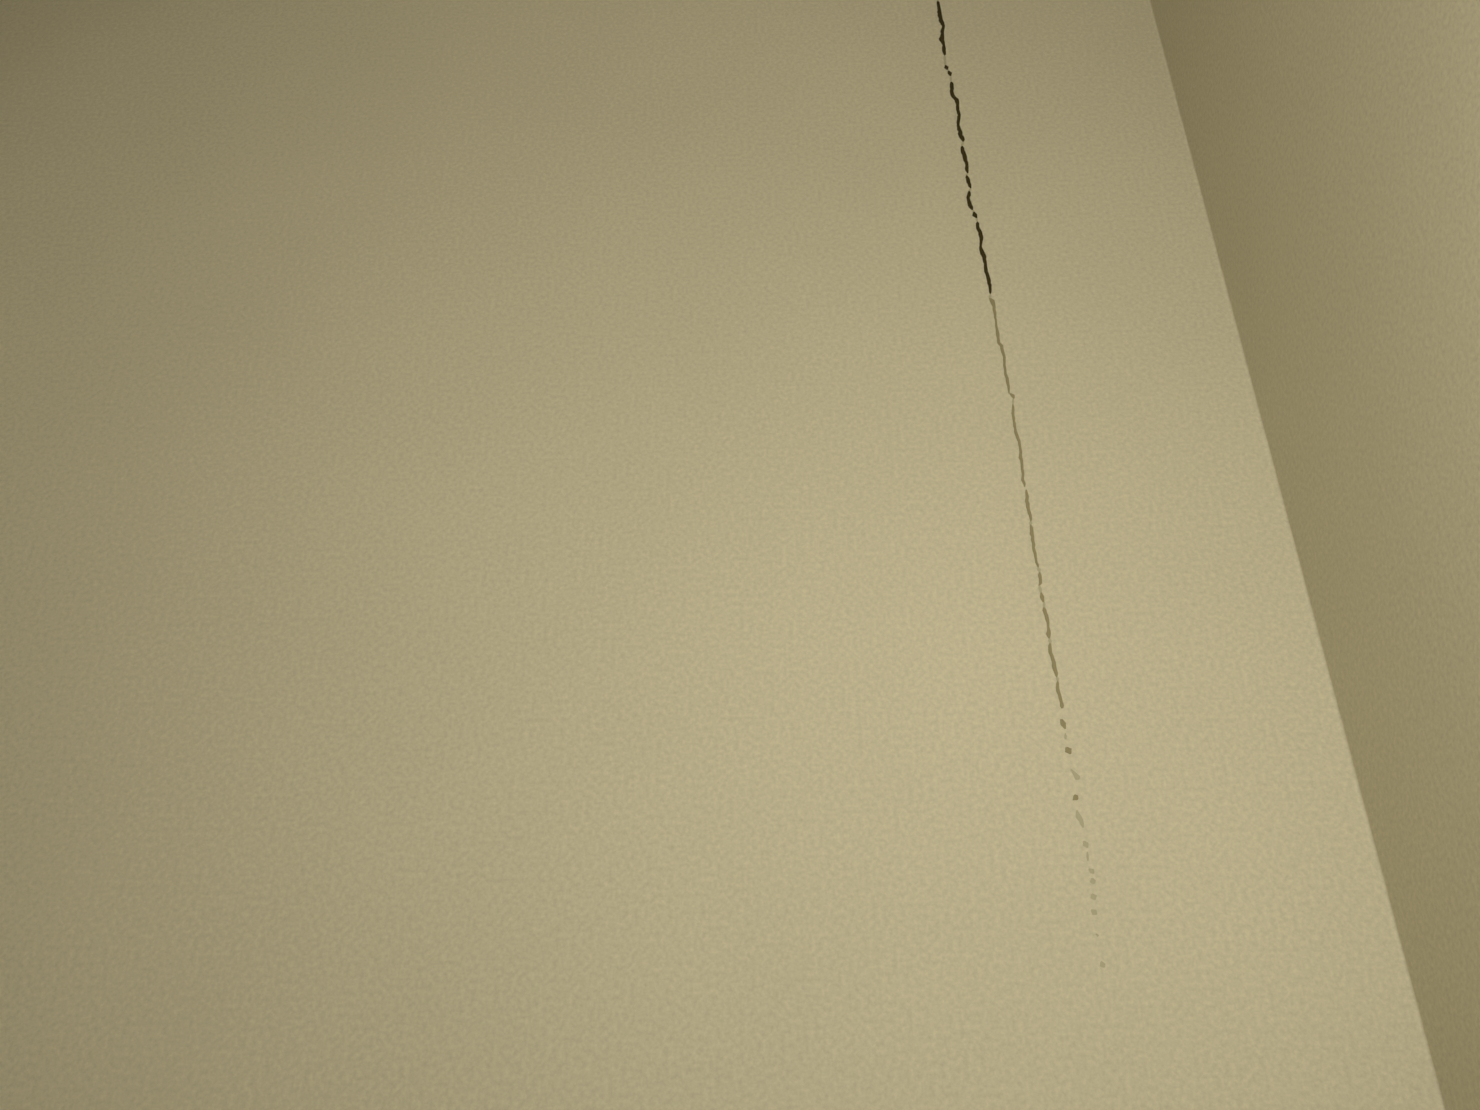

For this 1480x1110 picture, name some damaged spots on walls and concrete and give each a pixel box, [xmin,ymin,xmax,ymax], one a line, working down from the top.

crack [937,0,1105,968]